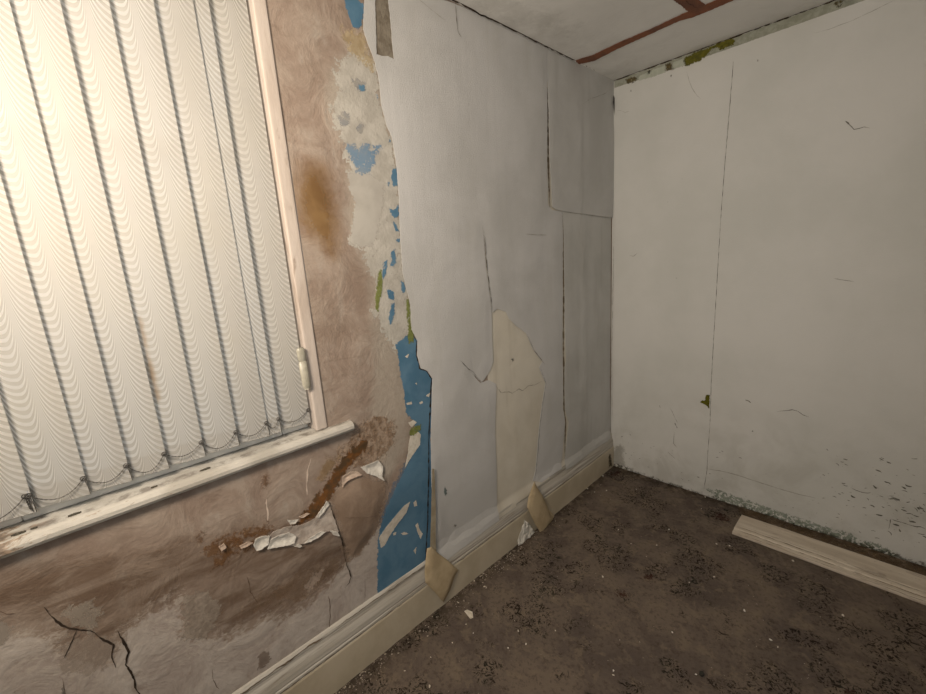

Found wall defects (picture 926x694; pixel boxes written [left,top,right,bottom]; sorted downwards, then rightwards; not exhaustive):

damp [295,161,339,257]
peeling [325,0,432,594]
spalling [239,501,340,551]
mould [614,458,926,566]
crack [44,607,140,694]